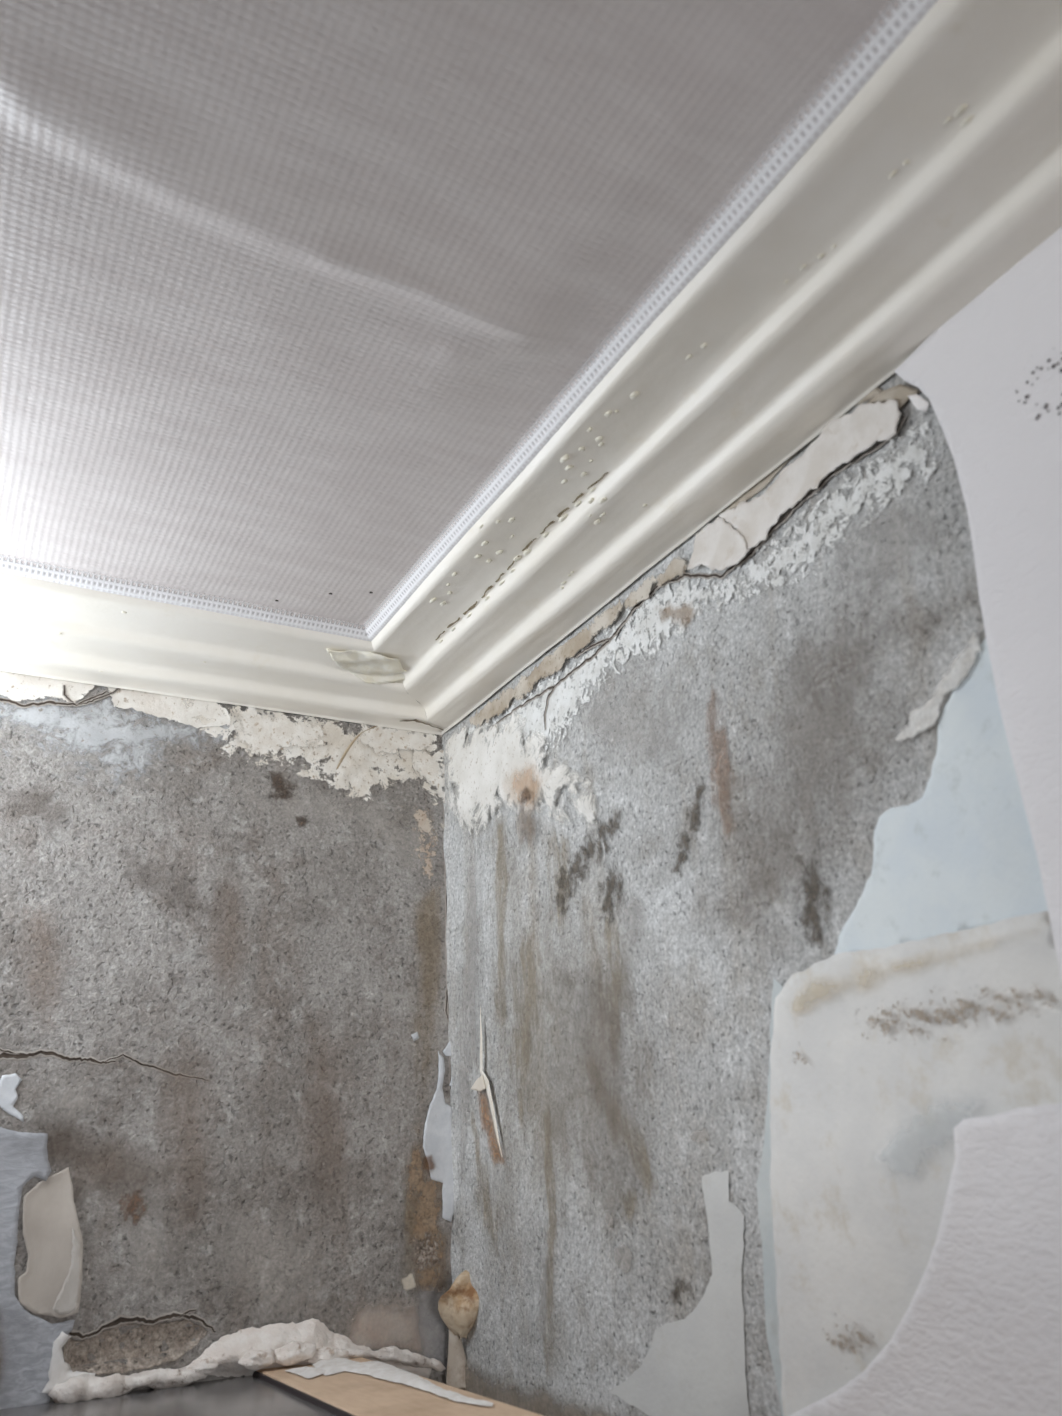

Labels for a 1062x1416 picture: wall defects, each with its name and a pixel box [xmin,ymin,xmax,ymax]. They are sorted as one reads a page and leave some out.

water stain [1016,358,1062,420]
peeling [469,384,930,728]
crack [0,685,120,708]
peeling [0,671,446,806]
water stain [556,812,622,923]
water stain [671,785,704,875]
water stain [802,861,830,944]
water stain [862,984,1057,1044]
crack [0,1047,209,1082]
peeling [471,1006,503,1161]
spalling [63,1319,207,1375]
crack [68,1308,216,1340]